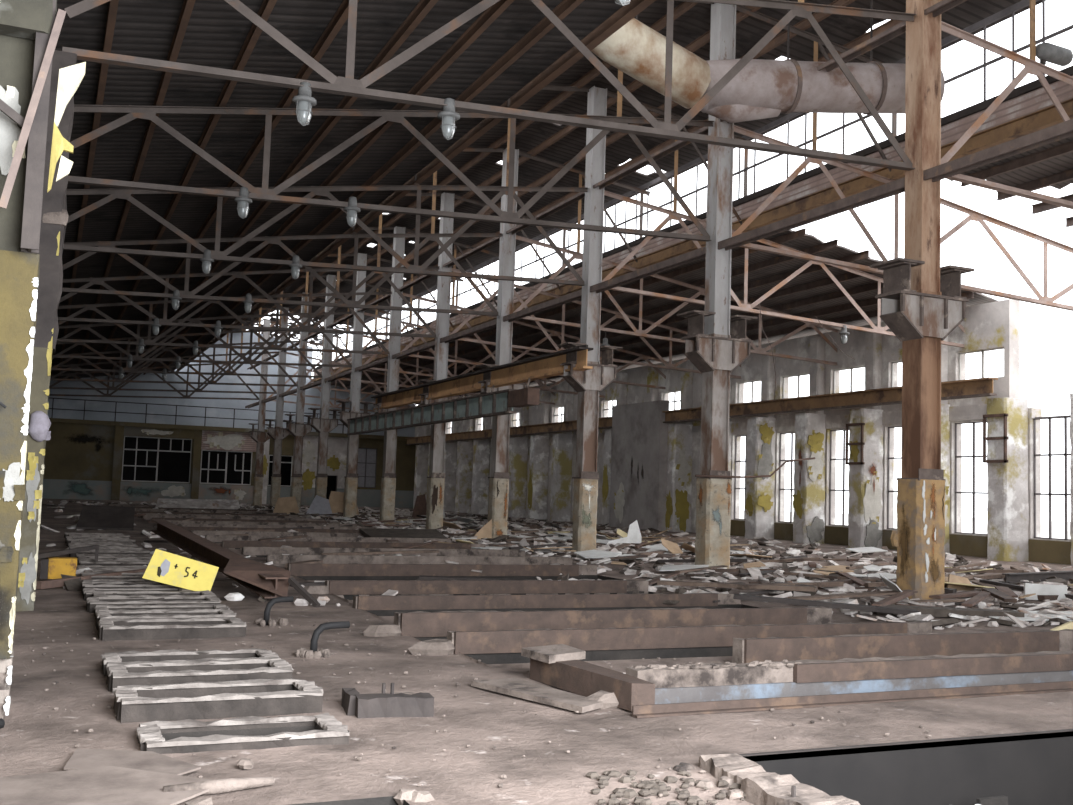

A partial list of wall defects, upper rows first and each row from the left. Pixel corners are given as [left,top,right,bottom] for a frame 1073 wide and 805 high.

peeling [0,85,26,175]
peeling [46,328,54,376]
peeling [0,277,45,715]
peeling [922,468,950,583]